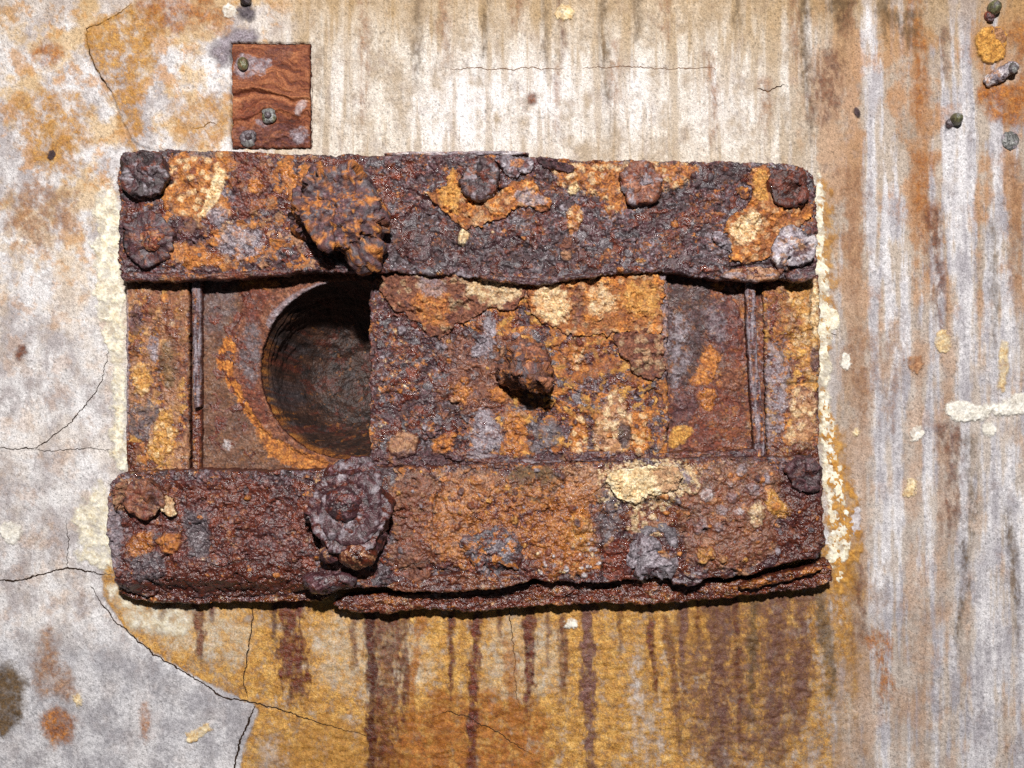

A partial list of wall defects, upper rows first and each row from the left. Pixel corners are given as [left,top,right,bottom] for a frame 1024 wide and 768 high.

crack [86,3,131,91]
crack [453,64,556,72]
crack [585,63,715,71]
corrosion [424,154,575,230]
corrosion [711,164,814,266]
crack [0,336,114,452]
corrosion [374,273,667,381]
water stain [840,353,852,370]
water stain [946,342,1024,436]
corrosion [605,464,684,505]
crack [0,521,366,768]
corrosion [102,544,861,768]